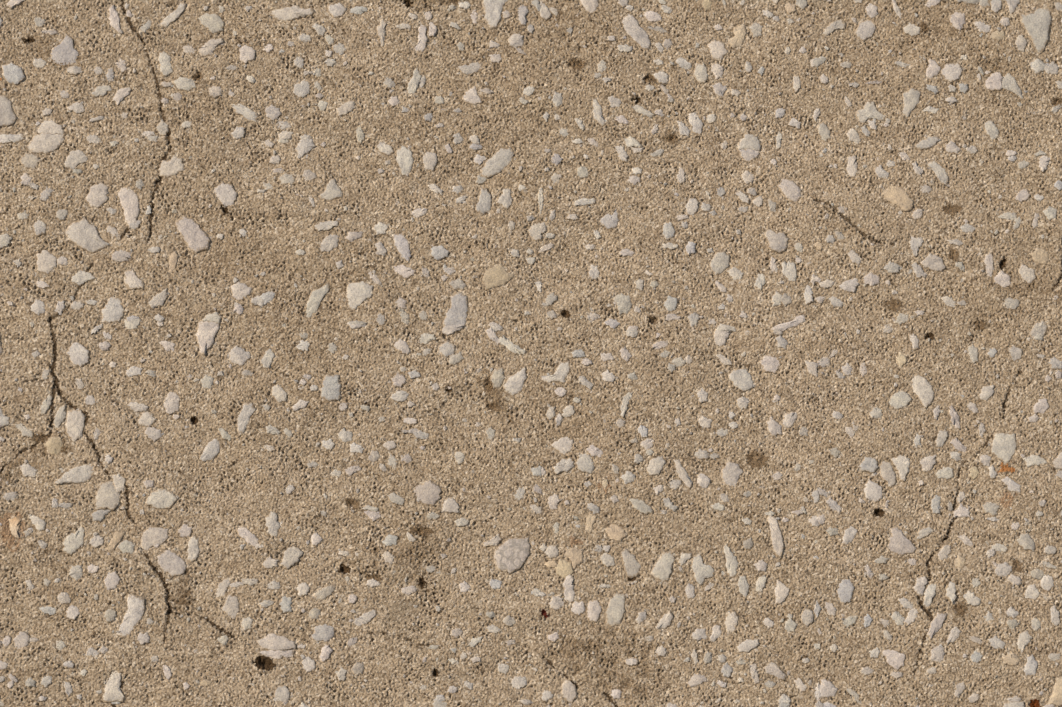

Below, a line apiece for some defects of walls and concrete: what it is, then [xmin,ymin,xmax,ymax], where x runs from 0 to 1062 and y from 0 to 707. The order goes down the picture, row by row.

crack [120,0,172,243]
crack [0,263,234,642]
crack [914,368,1022,674]